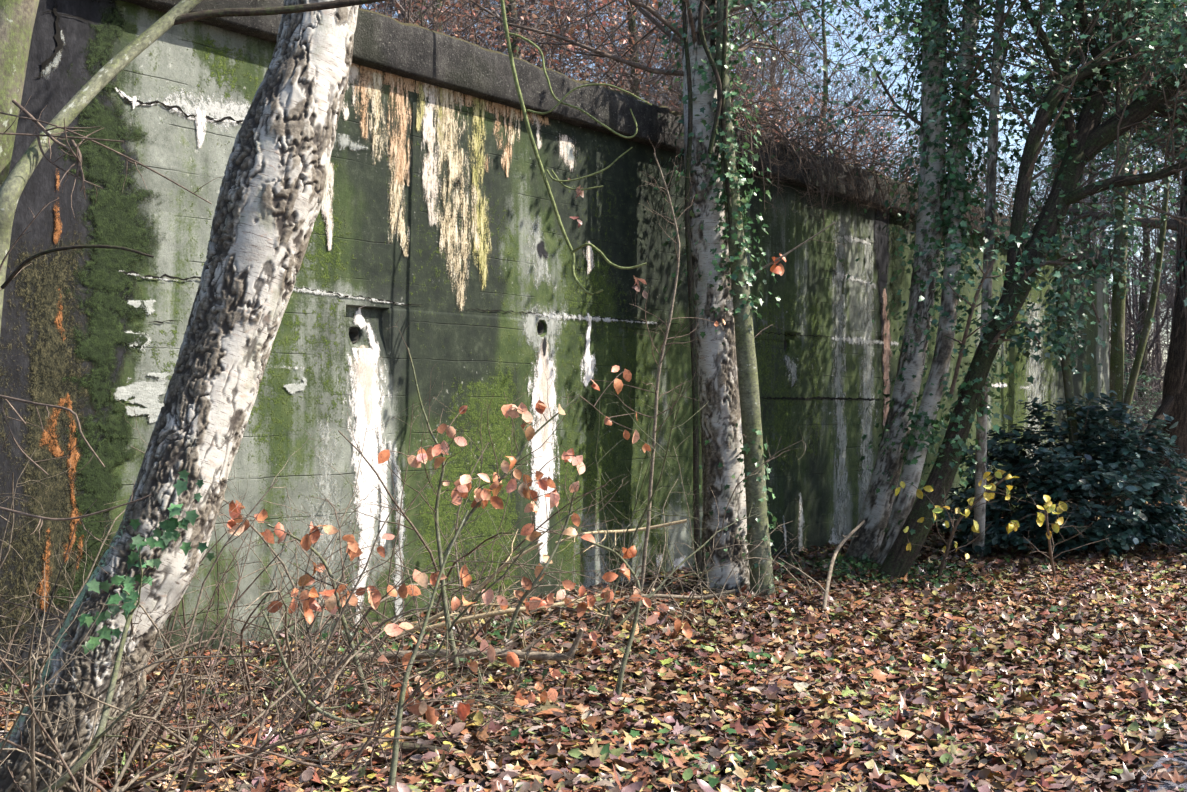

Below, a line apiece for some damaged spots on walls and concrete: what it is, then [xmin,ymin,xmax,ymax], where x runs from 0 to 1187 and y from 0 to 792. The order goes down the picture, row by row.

crack [115,86,250,148]
rust [53,169,62,244]
damp [321,163,334,251]
damp [334,63,549,311]
spalling [126,330,151,351]
spalling [114,372,169,423]
spalling [128,299,156,315]
damp [523,305,565,358]
damp [831,208,908,541]
rust [38,393,84,614]